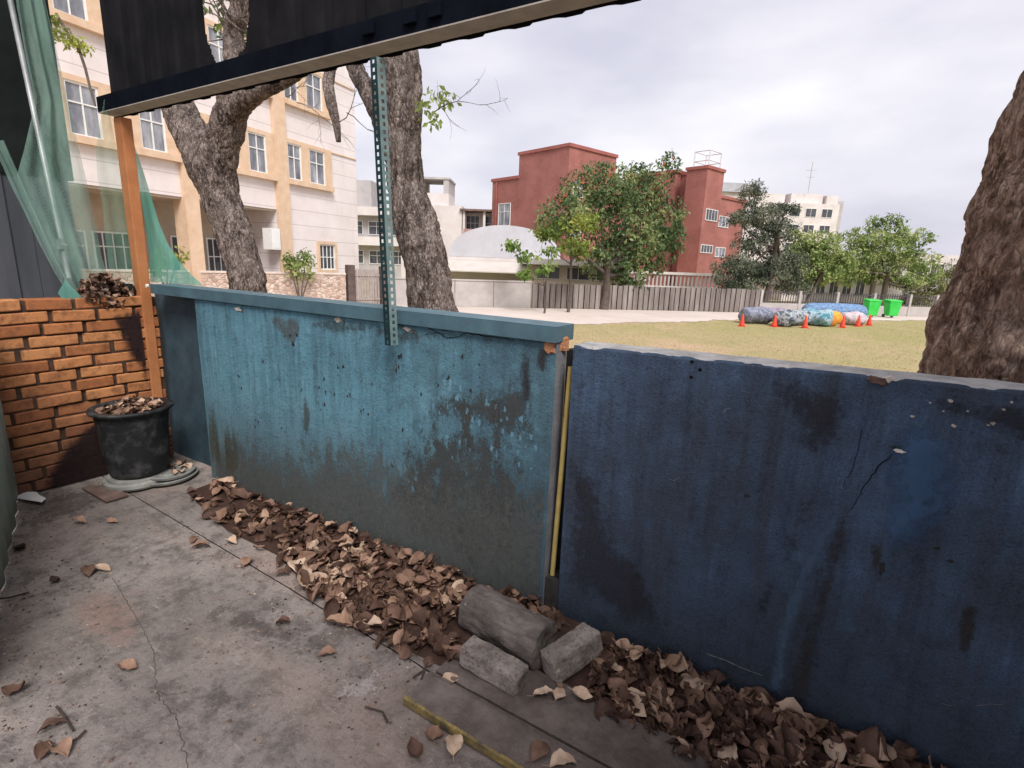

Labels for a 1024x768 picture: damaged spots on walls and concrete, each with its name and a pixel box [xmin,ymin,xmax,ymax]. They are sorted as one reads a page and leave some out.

leakage [214,350,546,602]
crack [844,429,892,508]
crack [103,578,188,768]